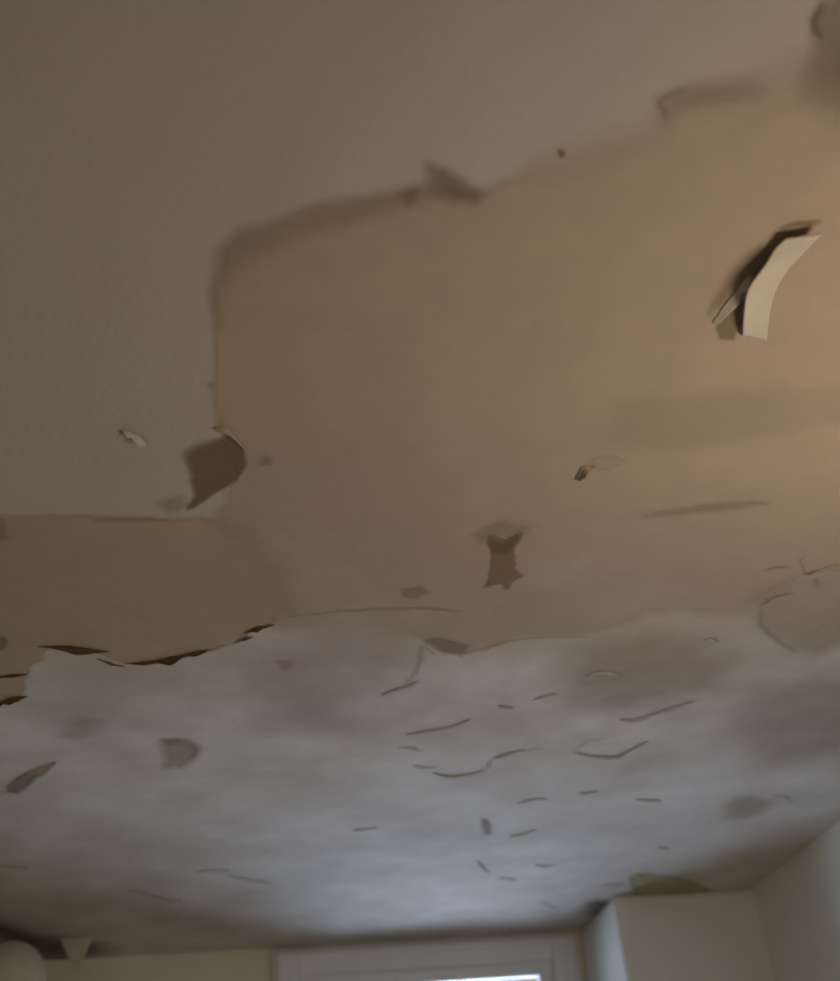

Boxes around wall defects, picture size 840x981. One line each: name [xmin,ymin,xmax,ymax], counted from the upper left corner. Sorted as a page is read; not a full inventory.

peeling [712,223,822,341]
peeling [485,534,522,589]
peeling [0,517,277,707]
peeling [7,763,57,793]
spalling [602,873,709,895]